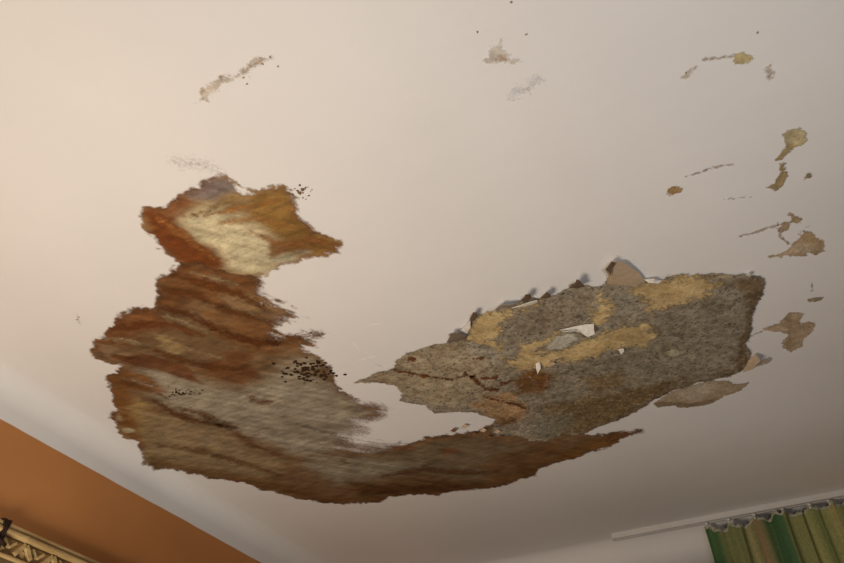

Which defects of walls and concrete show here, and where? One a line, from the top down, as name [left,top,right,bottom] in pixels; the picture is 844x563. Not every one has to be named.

peeling [733,52,754,64]
peeling [200,76,230,102]
peeling [767,128,807,191]
peeling [768,213,825,258]
peeling [354,261,772,442]
peeling [763,312,815,352]